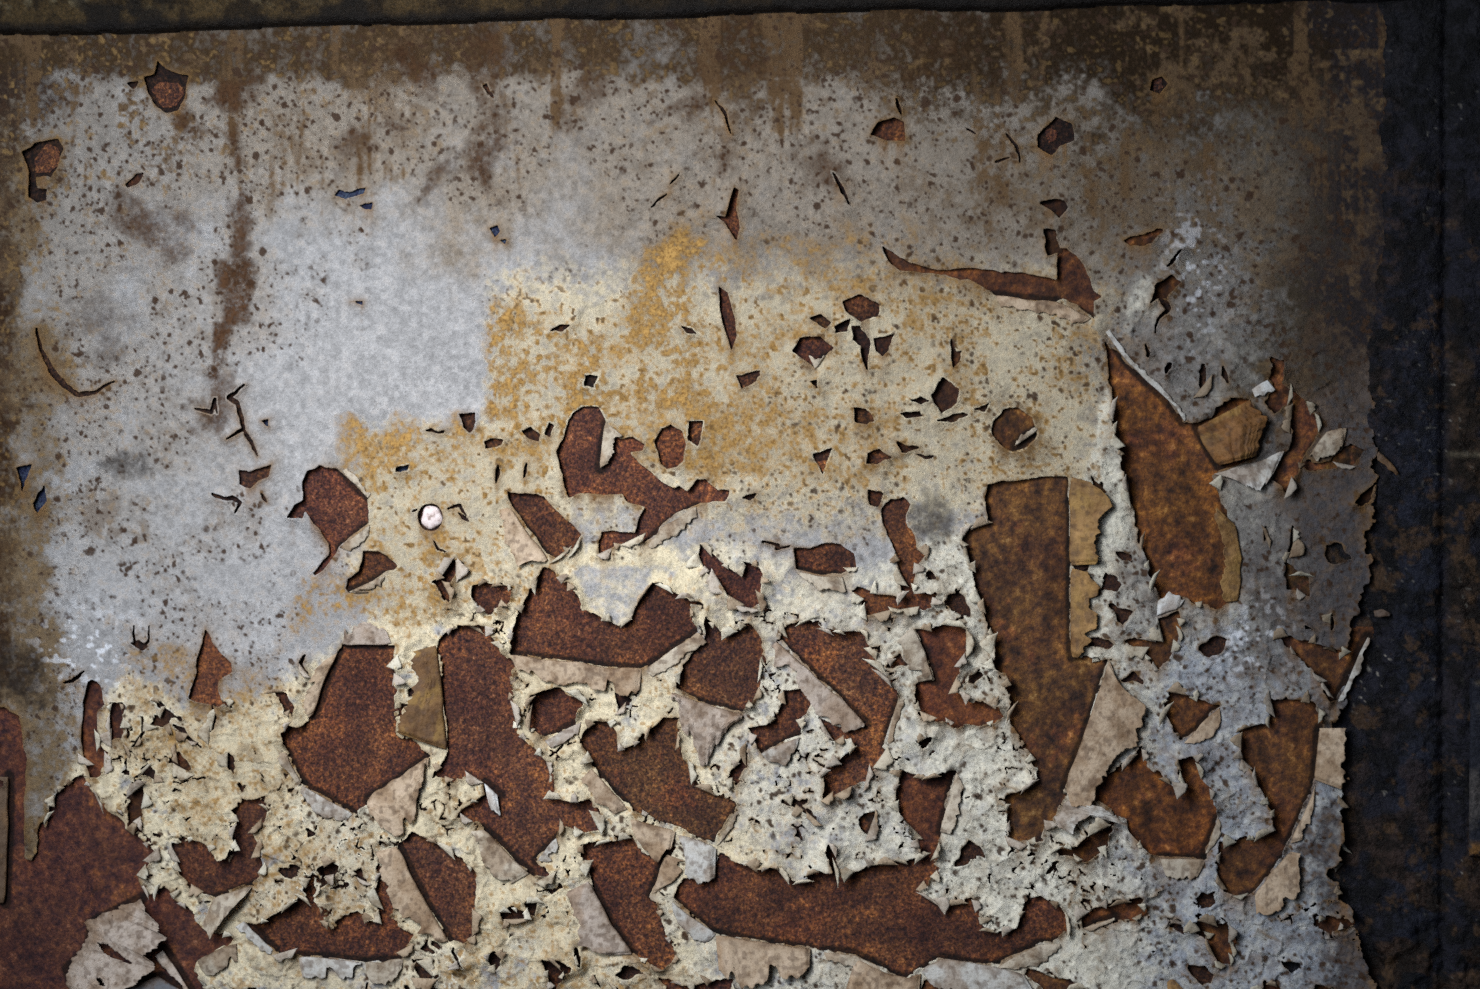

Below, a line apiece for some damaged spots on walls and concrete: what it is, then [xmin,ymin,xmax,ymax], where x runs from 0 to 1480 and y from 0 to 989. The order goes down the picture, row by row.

rust [212,75,257,111]
rust [229,131,241,168]
rust [467,85,501,181]
peeling [883,199,1101,323]
crack [36,328,115,397]
rust [342,227,986,509]
peeling [792,294,894,388]
crack [194,384,258,456]
crack [212,493,267,513]
peeling [523,406,756,553]
peeling [1105,329,1399,669]
peeling [0,464,1390,989]